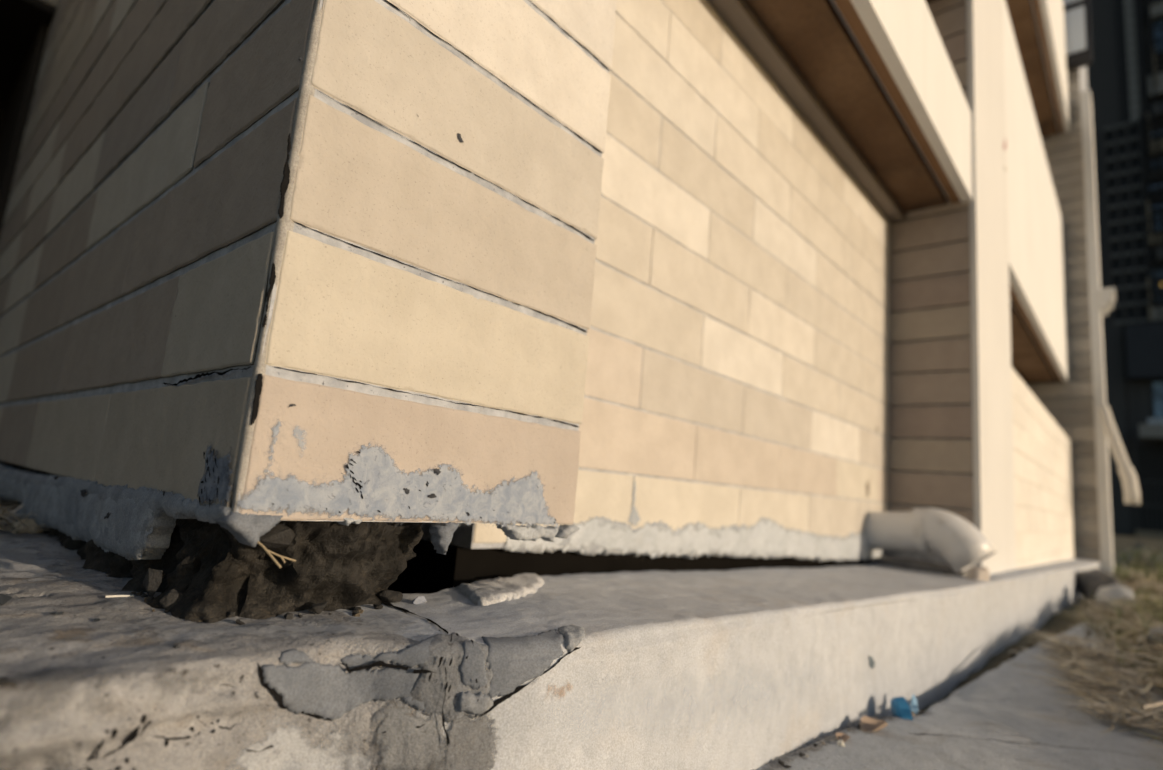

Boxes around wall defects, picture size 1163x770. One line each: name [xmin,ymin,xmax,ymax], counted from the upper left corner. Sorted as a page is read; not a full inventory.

crack [278,134,587,332]
crack [262,263,276,327]
crack [164,366,578,427]
peeling [558,624,585,652]
peeling [261,637,436,721]
peeling [458,641,493,715]